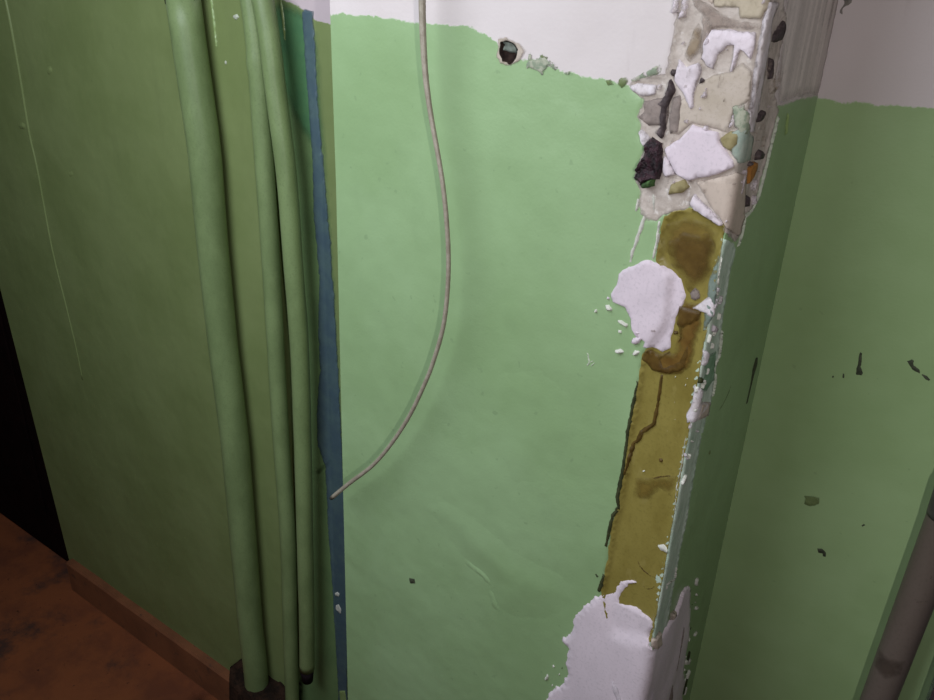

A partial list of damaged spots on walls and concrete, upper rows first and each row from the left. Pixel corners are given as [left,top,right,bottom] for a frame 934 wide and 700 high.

spalling [497,37,570,75]
spalling [595,0,787,650]
crack [623,375,663,475]